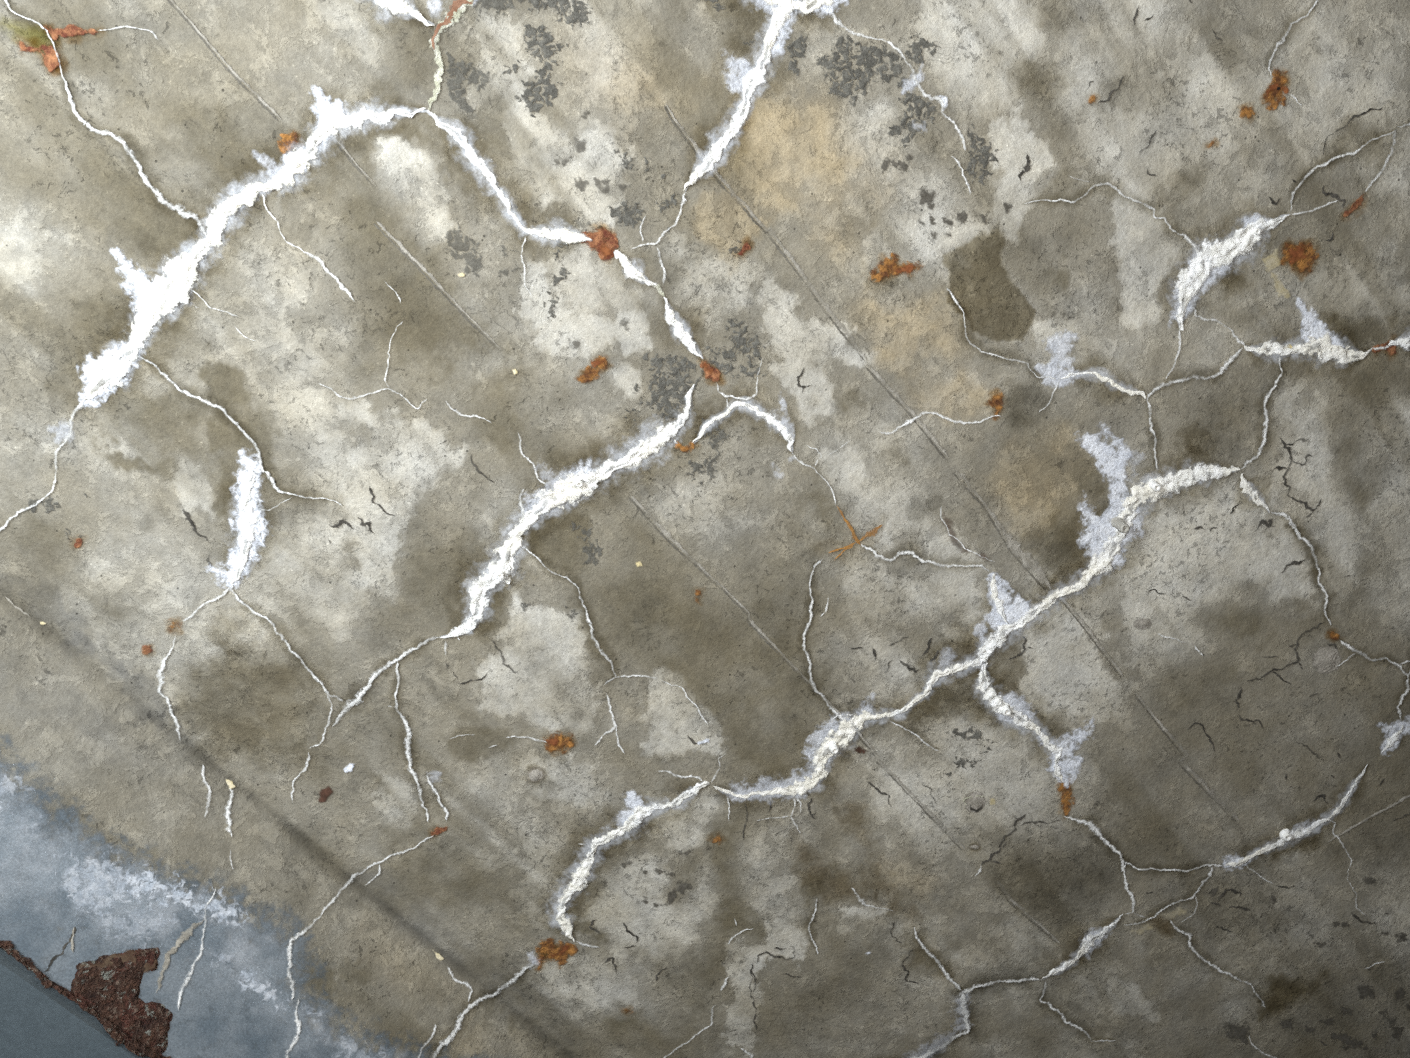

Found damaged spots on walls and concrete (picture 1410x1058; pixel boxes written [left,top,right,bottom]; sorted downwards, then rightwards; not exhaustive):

crack [428,0,473,110]
rust [1240,70,1289,118]
rust [581,221,619,260]
leakage [614,0,970,359]
rust [870,253,923,282]
leakage [55,66,836,800]
leakage [553,123,1410,948]
crack [1195,437,1410,785]
crack [287,663,449,1058]
rust [0,940,173,1058]
leakage [119,871,246,1009]
crack [418,966,531,1058]